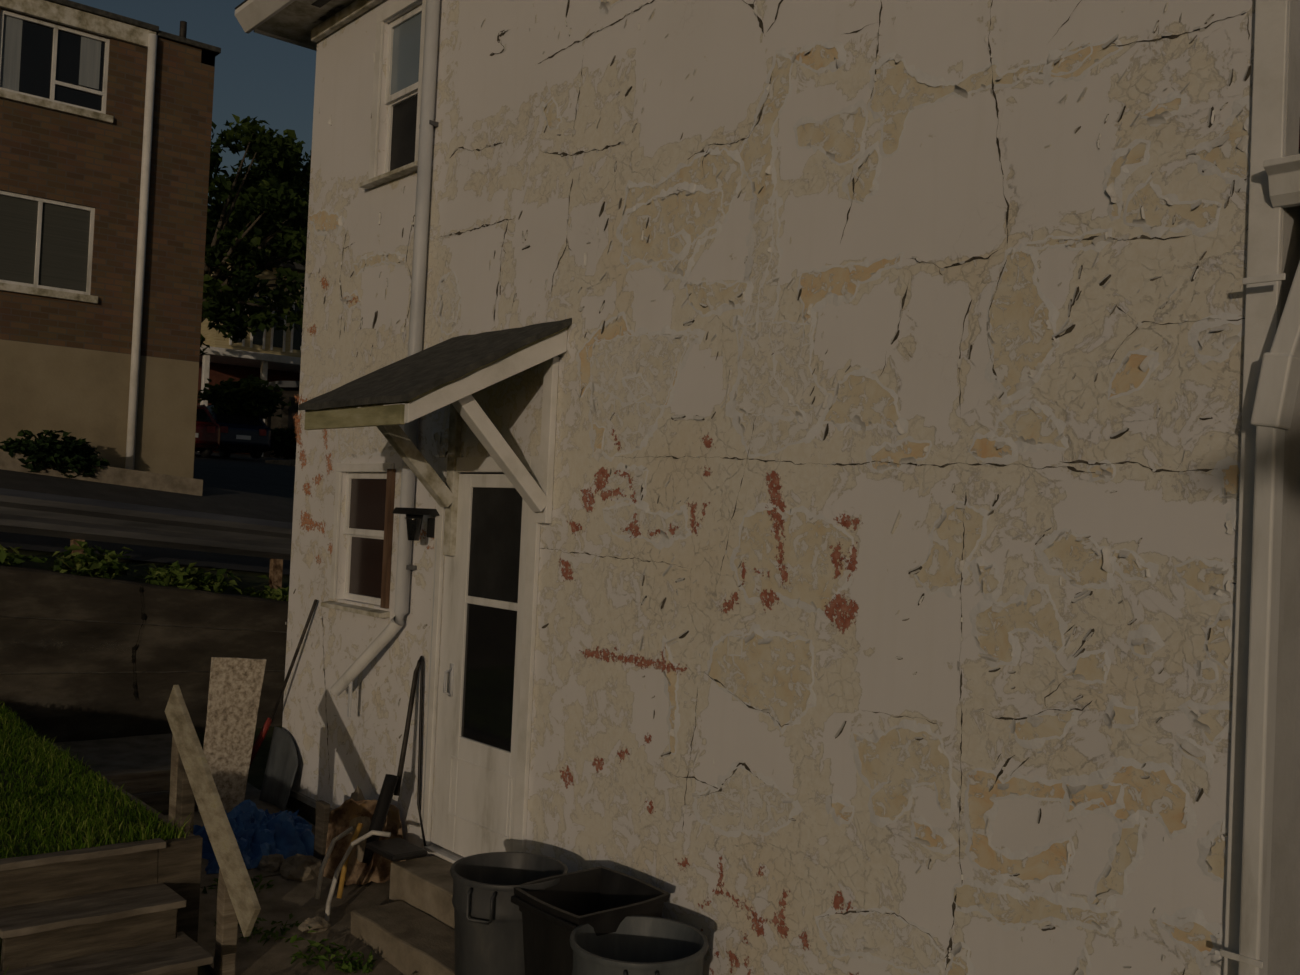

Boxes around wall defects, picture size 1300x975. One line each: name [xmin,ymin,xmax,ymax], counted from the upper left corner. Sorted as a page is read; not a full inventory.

crack [742,0,783,36]
crack [398,219,512,338]
crack [538,0,654,297]
crack [880,0,1009,414]
peeling [842,34,1123,204]
crack [1059,233,1194,243]
peeling [1016,65,1252,340]
peeling [1181,297,1246,365]
peeling [336,426,396,463]
peeling [730,502,856,618]
crack [614,420,1212,970]
peeling [815,906,975,975]